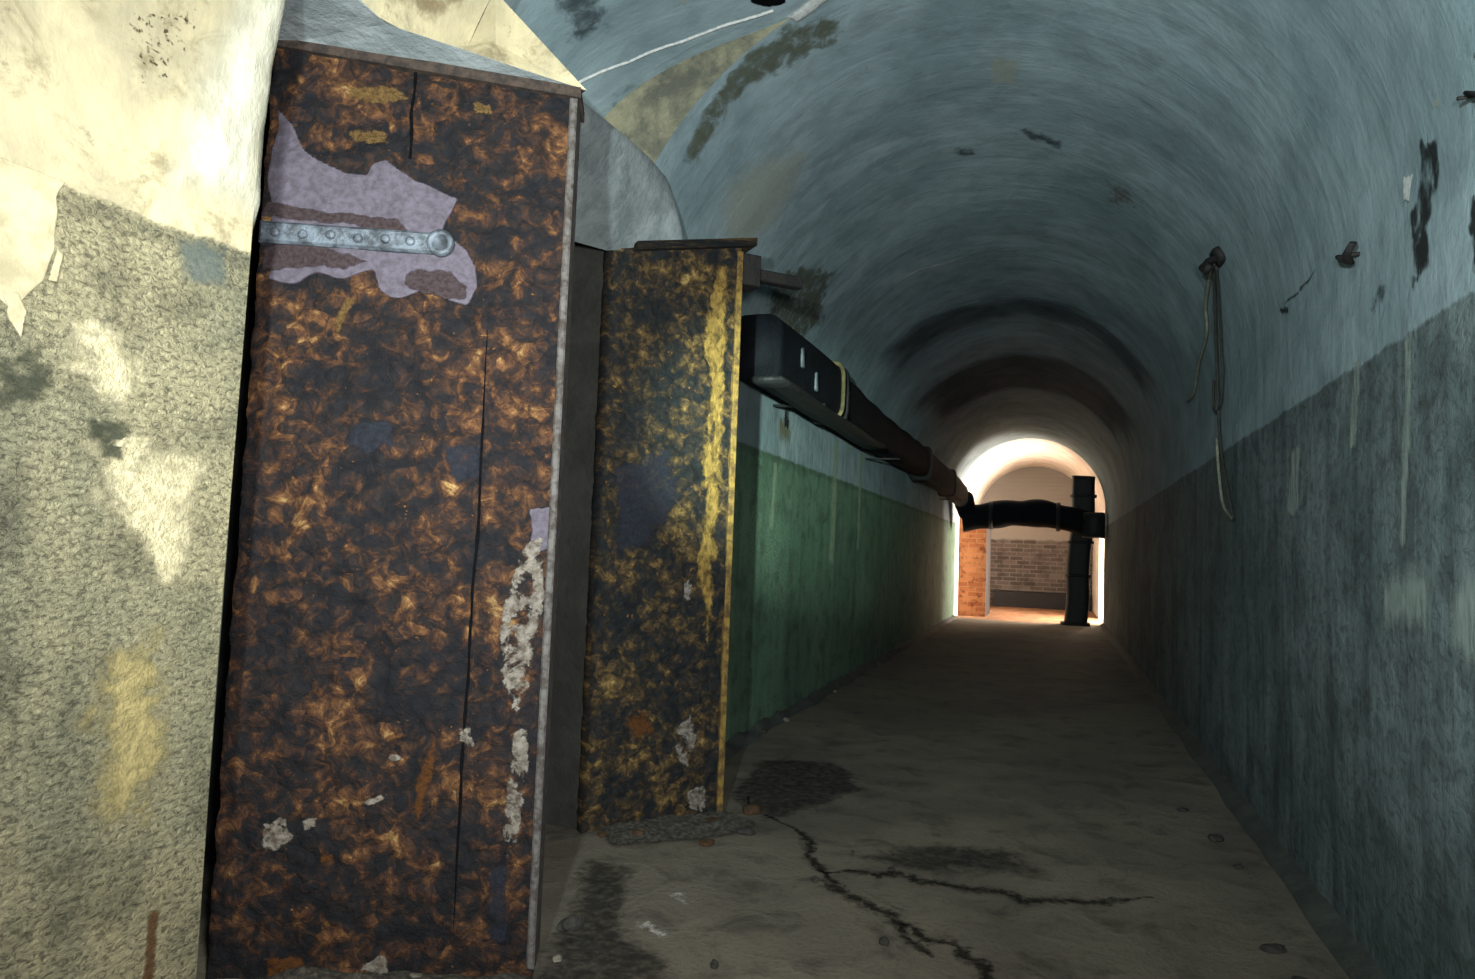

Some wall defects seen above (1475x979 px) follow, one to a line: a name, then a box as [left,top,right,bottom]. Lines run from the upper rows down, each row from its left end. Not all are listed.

rust [350,130,387,143]
rust [350,86,407,104]
rust [474,102,492,114]
leakage [687,20,837,159]
peeling [0,157,64,336]
peeling [69,318,145,404]
rust [336,298,355,332]
leakage [1410,139,1439,284]
peeling [98,434,207,584]
rust [413,739,435,819]
peeling [488,537,545,942]
crack [747,796,1154,979]